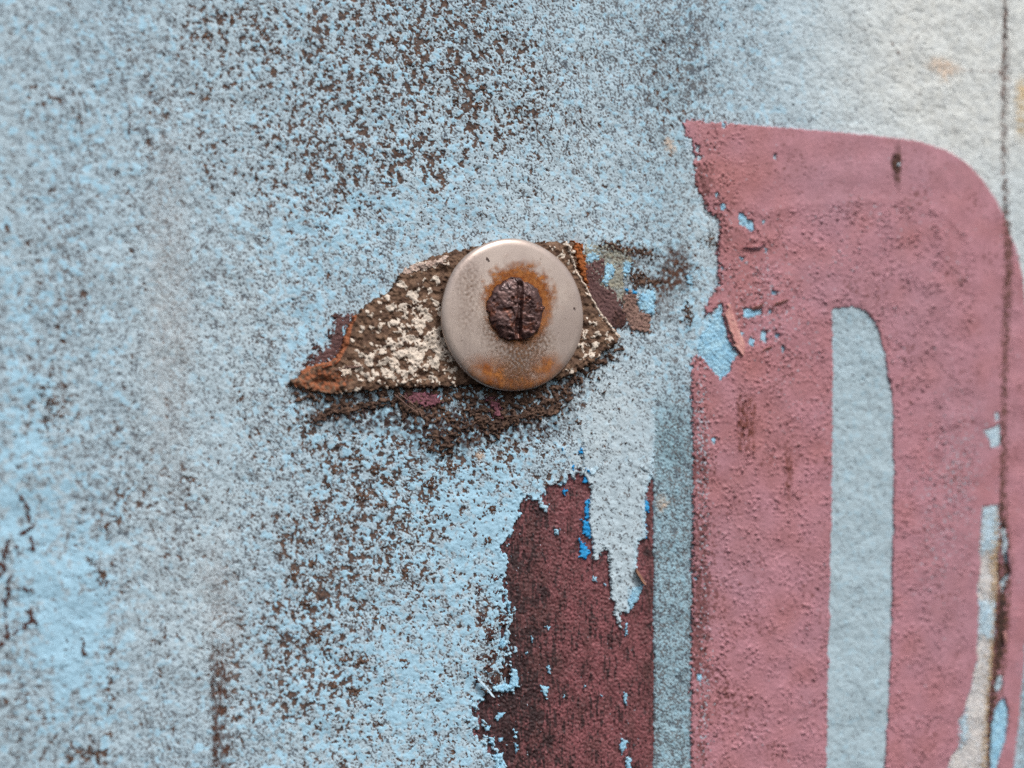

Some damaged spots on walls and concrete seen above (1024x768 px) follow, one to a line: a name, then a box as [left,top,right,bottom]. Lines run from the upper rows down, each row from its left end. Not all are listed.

spalling [738,212,765,232]
rust [570,240,590,289]
rust [484,264,555,344]
peeling [679,291,789,381]
rust [477,357,555,389]
peeling [284,234,693,636]
peeling [307,624,324,642]
peeling [334,653,369,666]
peeling [472,574,520,697]
peeling [323,677,363,701]
peeling [484,712,518,768]
peeling [619,738,632,768]